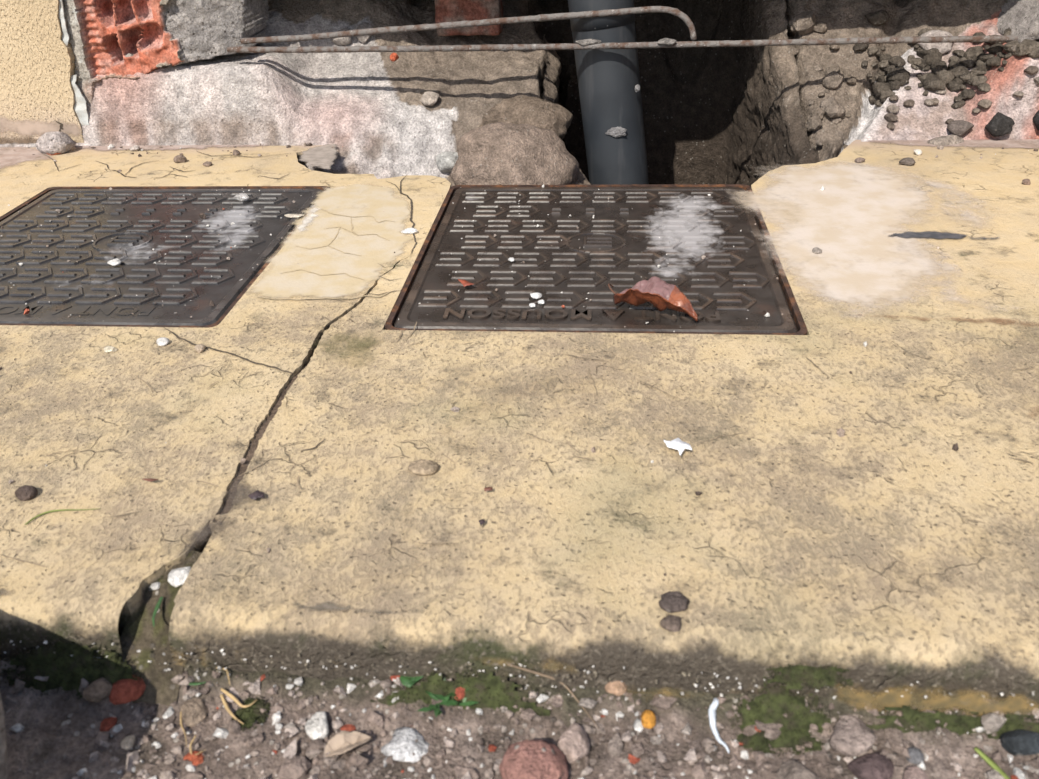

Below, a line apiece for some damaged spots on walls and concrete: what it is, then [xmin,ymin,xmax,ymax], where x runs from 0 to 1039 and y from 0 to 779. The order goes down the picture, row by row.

flaking render [58,0,100,125]
spalling [227,6,1020,61]
crack [254,177,417,321]
crack [162,326,311,523]
crack [528,433,589,459]
crack [0,554,46,567]
crack [120,550,202,707]